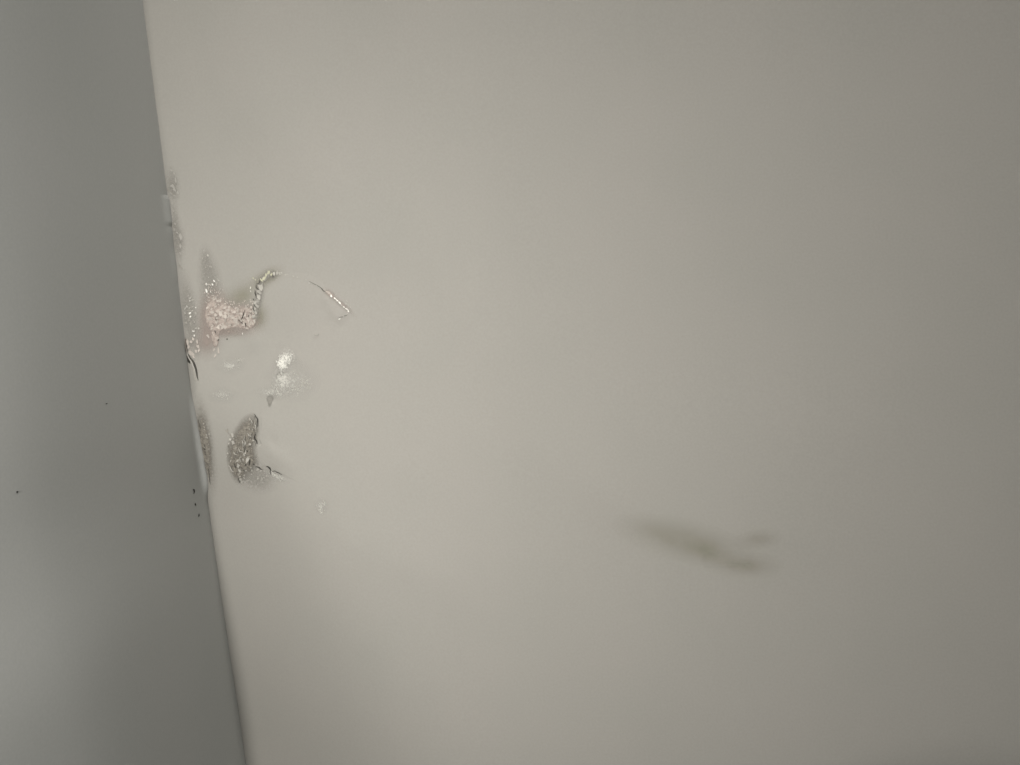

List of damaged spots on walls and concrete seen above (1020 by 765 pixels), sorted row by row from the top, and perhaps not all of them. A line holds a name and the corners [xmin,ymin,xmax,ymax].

peeling [183,250,351,358]
peeling [198,418,213,481]
peeling [225,413,258,483]